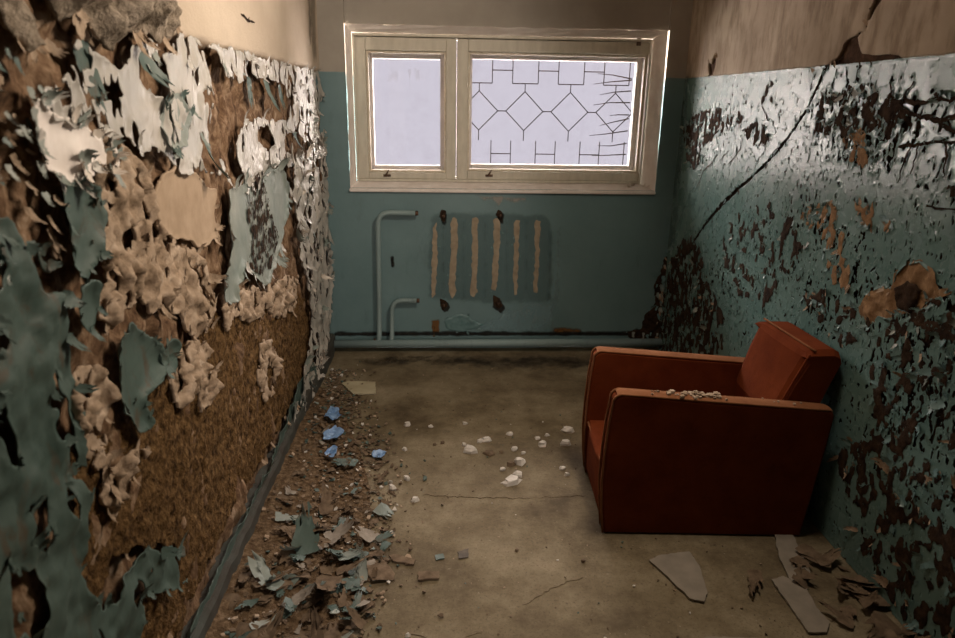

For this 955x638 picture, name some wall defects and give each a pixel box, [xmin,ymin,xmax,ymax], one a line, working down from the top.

spalling [810,36,902,73]
peeling [680,107,769,170]
crack [681,56,844,256]
peeling [761,77,774,105]
peeling [813,83,907,168]
peeling [928,88,954,106]
peeling [940,169,955,198]
peeling [626,235,725,355]
peeling [722,197,955,638]